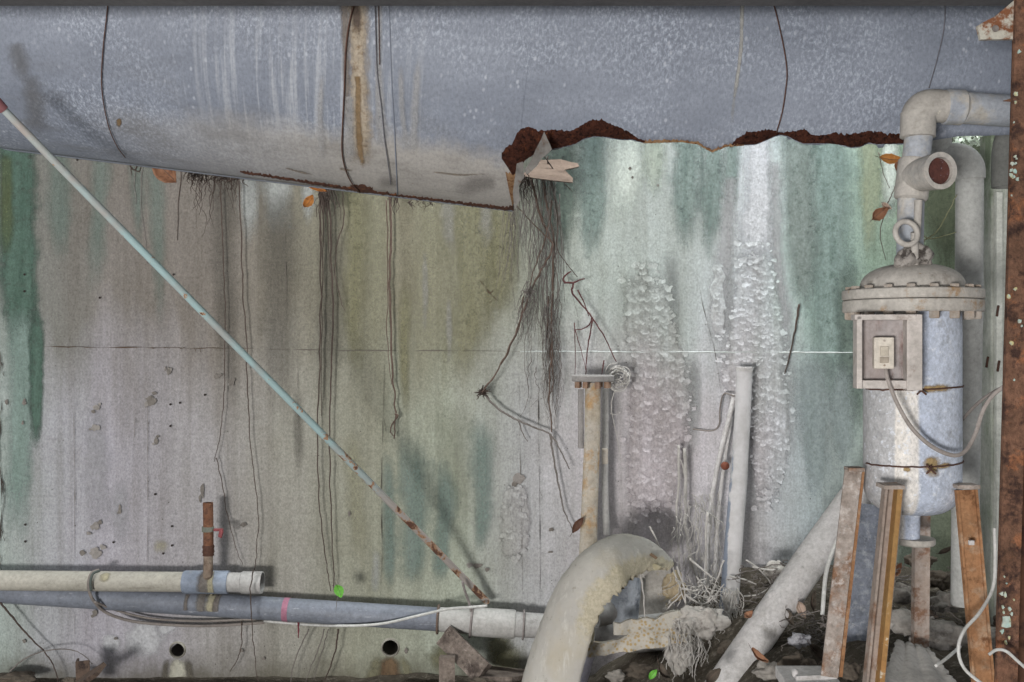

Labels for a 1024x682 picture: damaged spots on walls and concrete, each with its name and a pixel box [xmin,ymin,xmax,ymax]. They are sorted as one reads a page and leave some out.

corrosion [350,184,373,192]
water stain [581,137,663,242]
water stain [700,137,815,340]
water stain [883,144,897,204]
water stain [8,311,44,504]